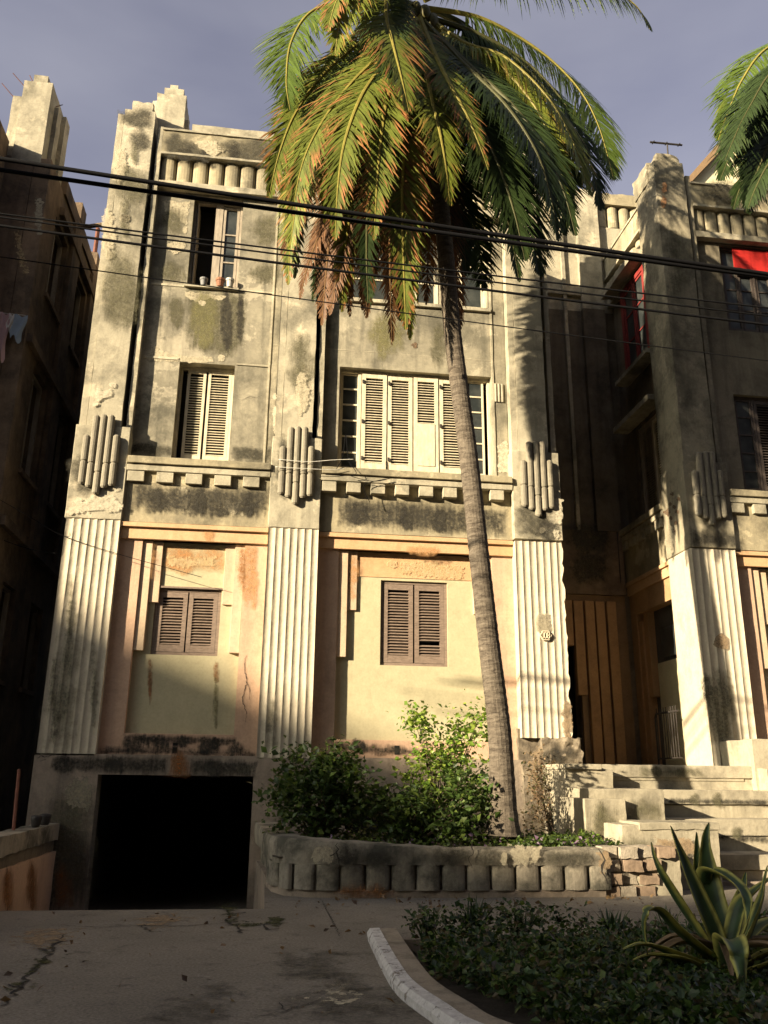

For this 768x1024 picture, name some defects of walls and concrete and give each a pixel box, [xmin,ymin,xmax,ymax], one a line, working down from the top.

leakage [117,109,151,236]
leakage [169,291,244,354]
peeling [295,368,310,416]
leakage [131,483,267,517]
leakage [338,499,467,532]
leakage [51,734,255,776]